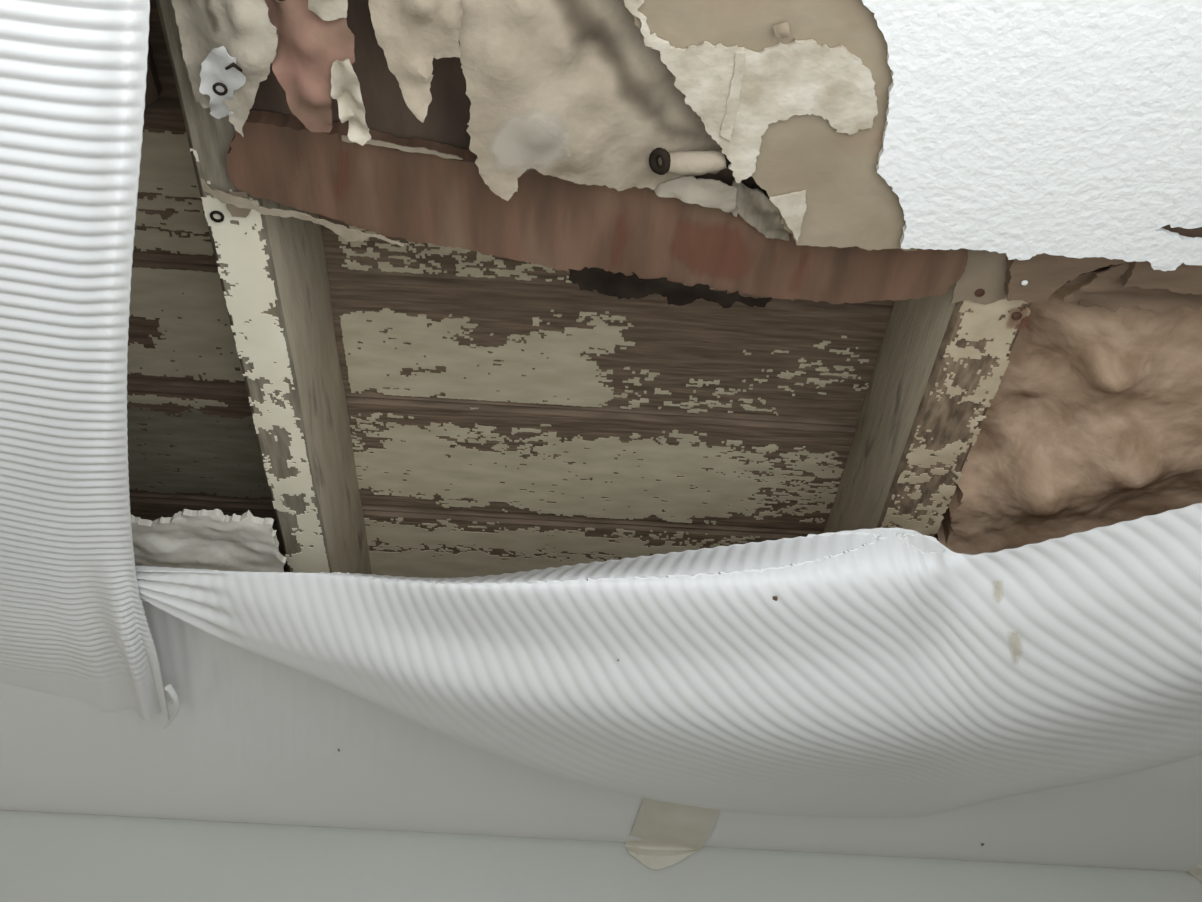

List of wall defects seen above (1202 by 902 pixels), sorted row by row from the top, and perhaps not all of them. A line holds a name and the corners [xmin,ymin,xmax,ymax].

peeling [127,129,330,573]
peeling [338,225,572,283]
leakage [492,113,567,167]
peeling [340,308,869,578]
leakage [563,0,660,116]
peeling [624,0,917,251]
peeling [880,294,1030,536]